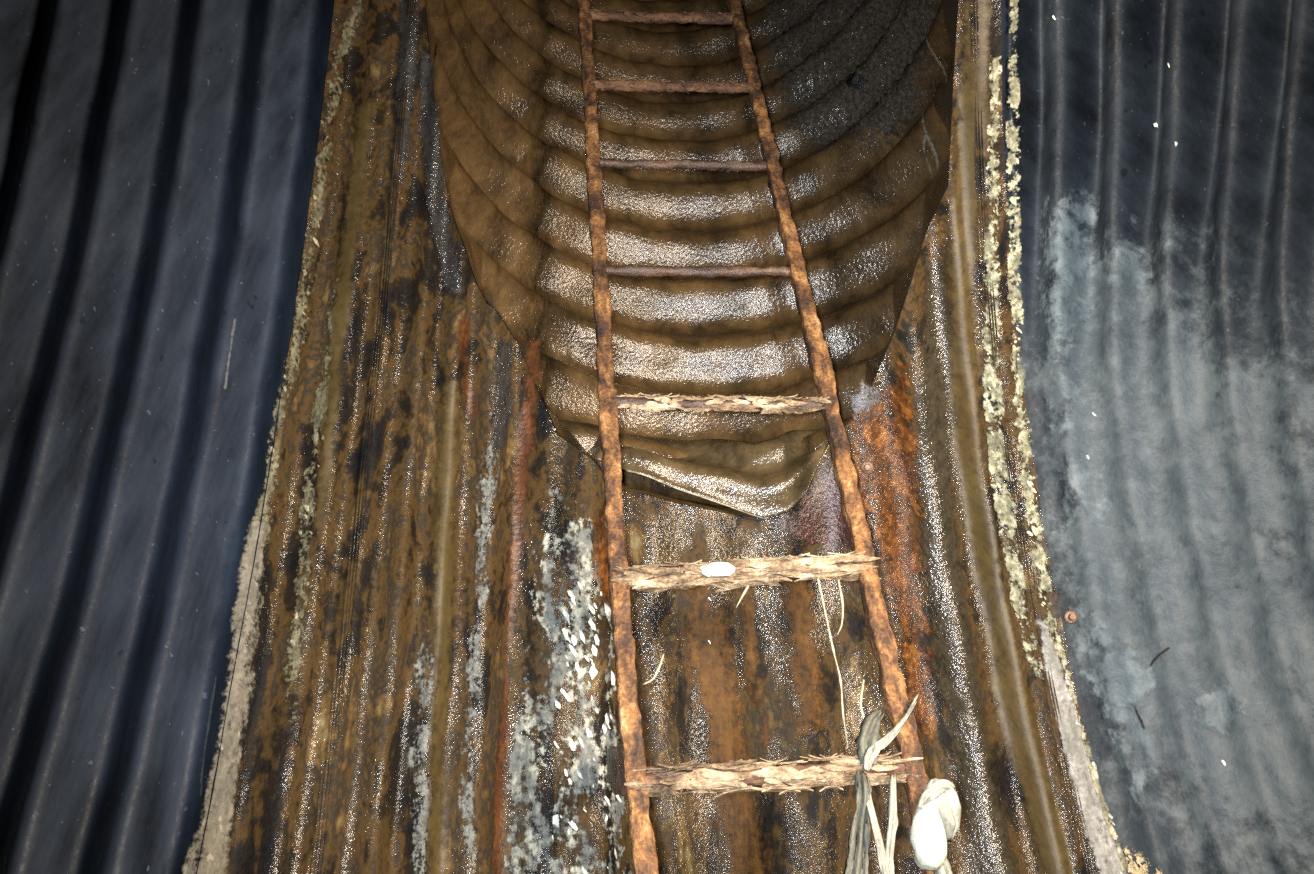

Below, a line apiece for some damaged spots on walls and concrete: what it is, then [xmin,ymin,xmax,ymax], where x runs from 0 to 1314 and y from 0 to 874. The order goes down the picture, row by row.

rust [458,318,477,419]
rust [492,339,542,874]
rust [592,516,609,604]
rust [778,461,851,555]
rust [849,361,936,738]
damp [916,0,1314,874]